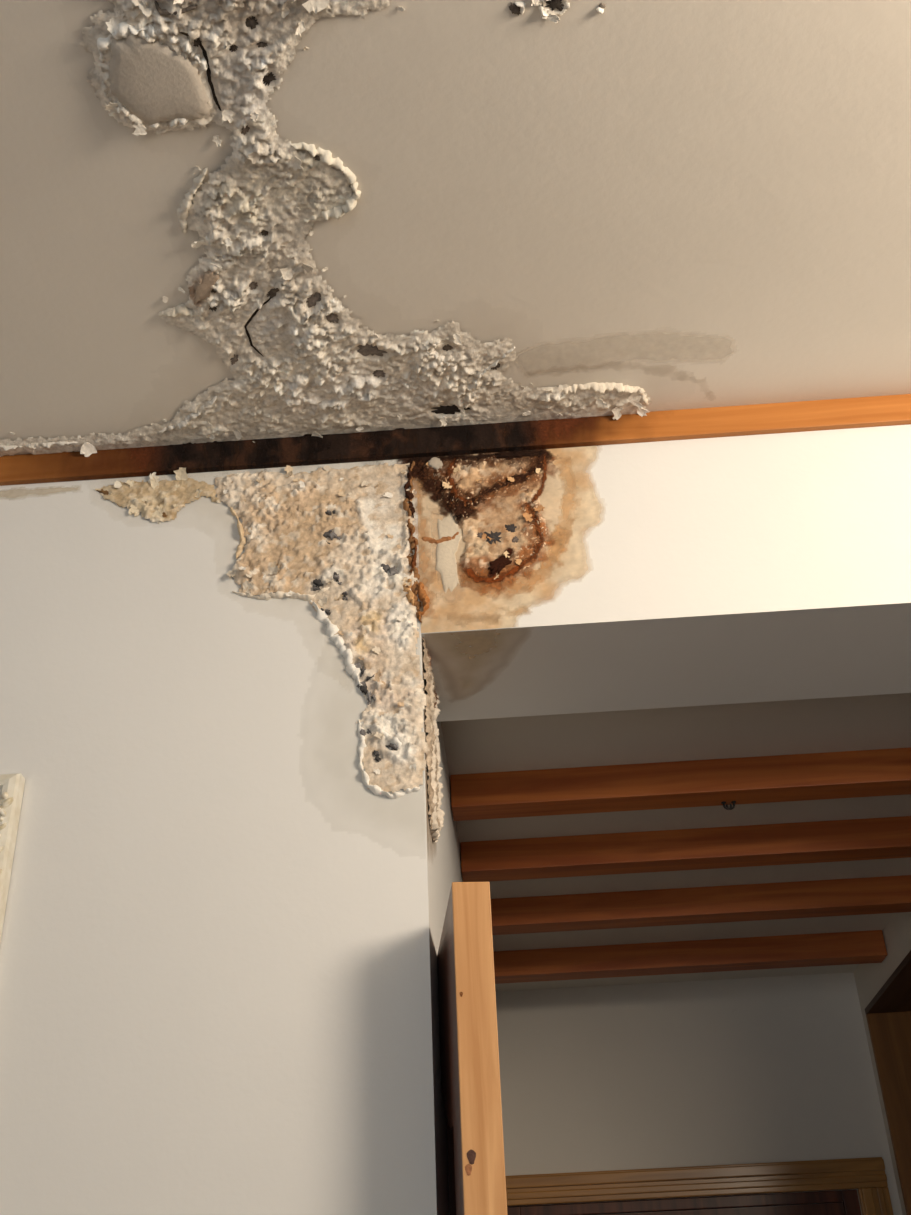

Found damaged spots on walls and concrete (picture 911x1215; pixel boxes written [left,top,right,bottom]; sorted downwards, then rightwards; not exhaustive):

peeling [0,0,651,457]
leakage [0,416,603,497]
peeling [95,449,555,843]
corrosion [413,445,600,633]